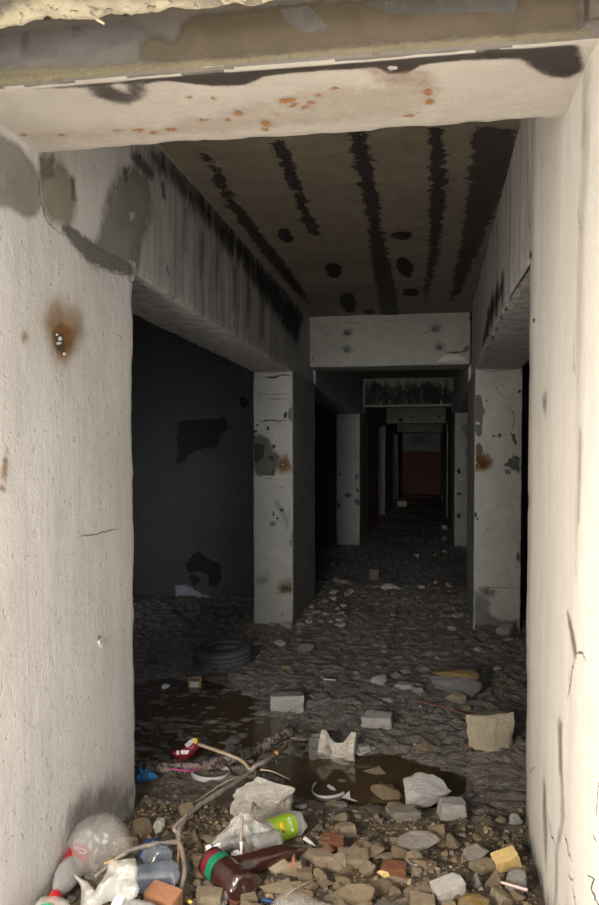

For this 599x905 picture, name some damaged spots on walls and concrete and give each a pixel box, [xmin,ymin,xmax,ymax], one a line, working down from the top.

leakage [270,140,322,236]
leakage [340,127,450,315]
rust [47,305,80,357]
peeling [475,395,517,454]
rust [475,453,492,471]
spalling [504,456,521,475]
crack [566,612,587,700]
crack [555,727,563,773]
crack [547,816,599,905]